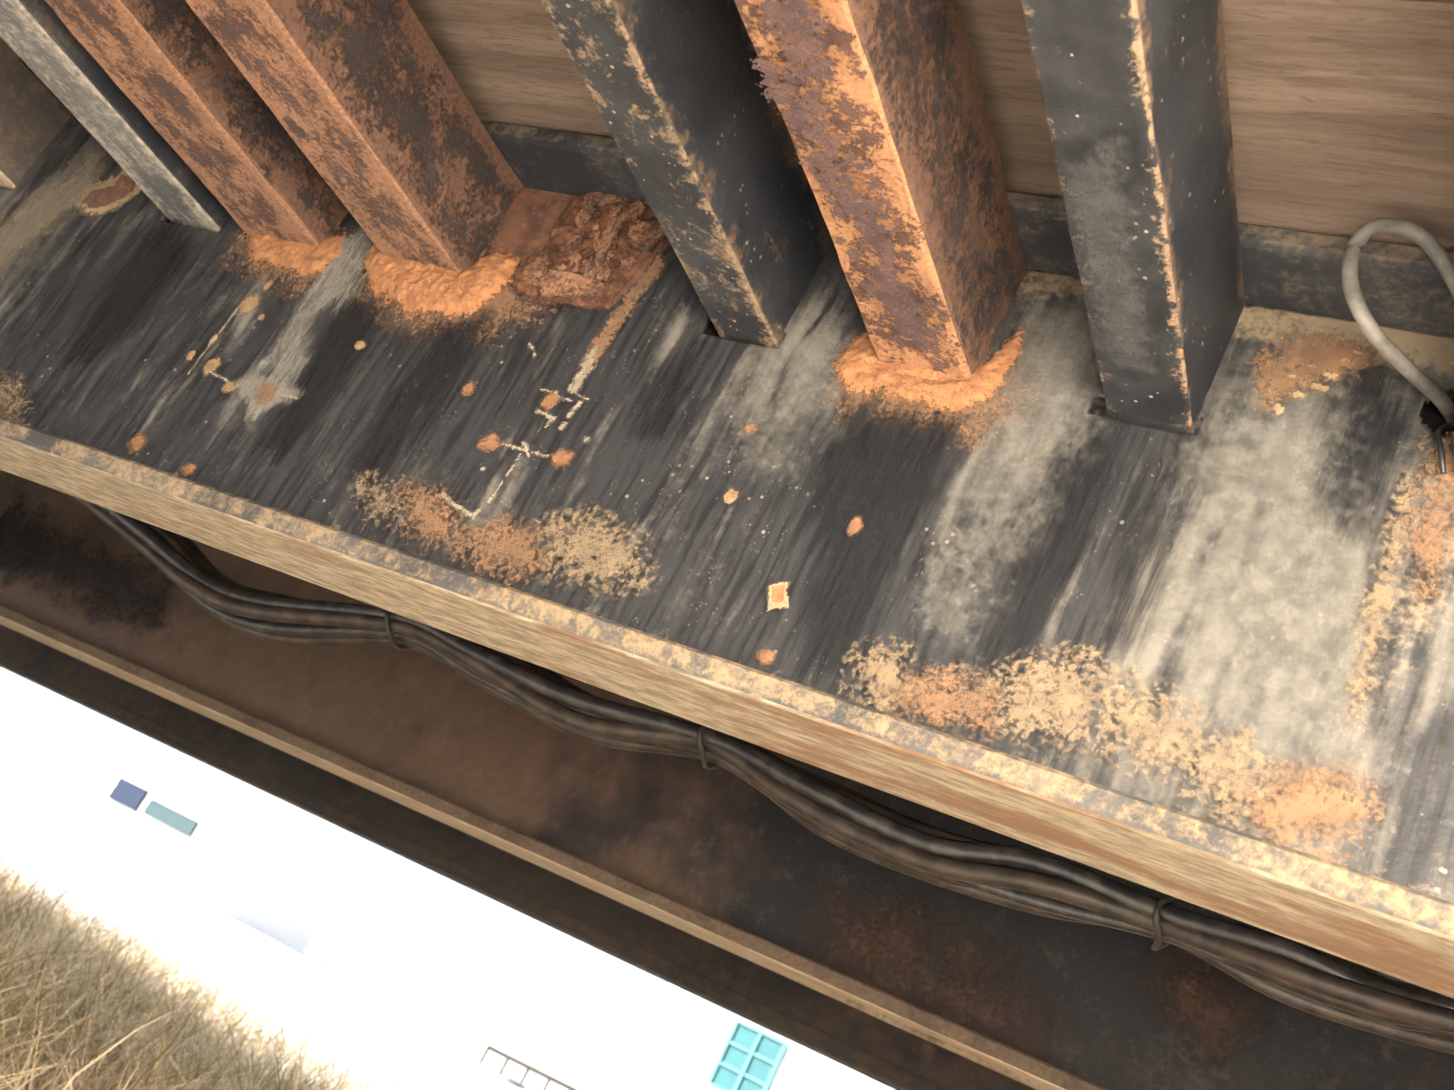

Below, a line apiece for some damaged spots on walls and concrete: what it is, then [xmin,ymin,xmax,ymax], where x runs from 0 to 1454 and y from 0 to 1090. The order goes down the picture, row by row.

leakage [63,220,190,367]
leakage [235,229,379,459]
leakage [354,314,487,477]
rust [217,187,670,410]
rust [394,475,551,585]
leakage [800,404,956,674]
leakage [981,412,1117,668]
leakage [1098,422,1206,660]
leakage [1317,371,1398,545]
rust [883,663,1005,741]
rust [1234,757,1384,863]